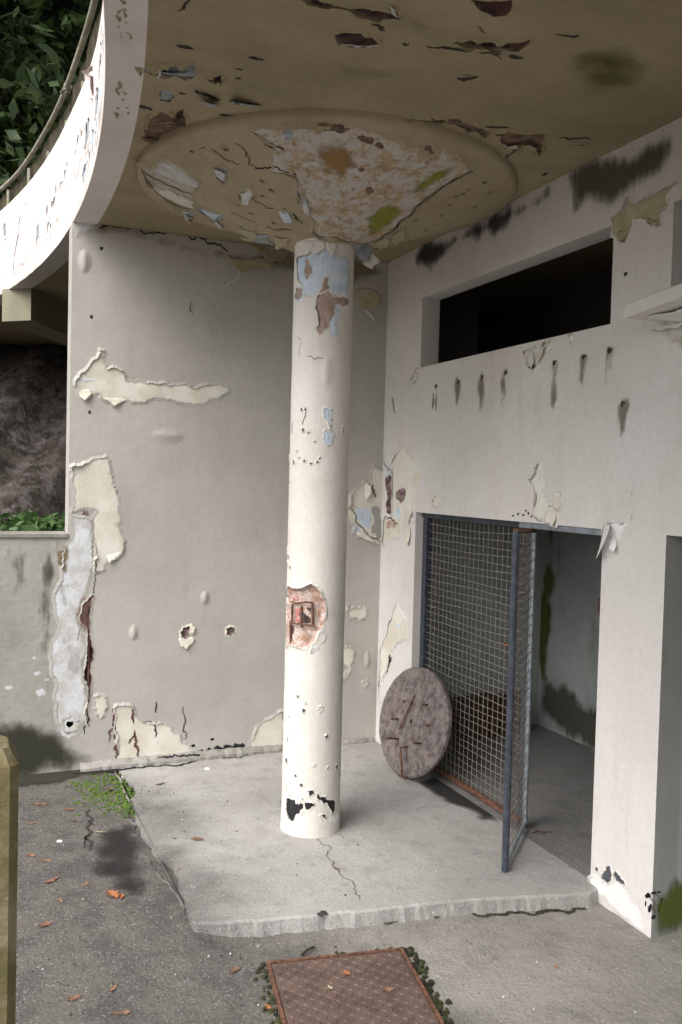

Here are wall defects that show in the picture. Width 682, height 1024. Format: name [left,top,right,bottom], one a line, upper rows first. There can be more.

crack [200,133,296,176]
crack [232,199,302,231]
peeling [135,44,495,337]
water stain [416,242,447,265]
water stain [467,208,520,237]
water stain [571,143,669,209]
peeling [72,347,231,409]
peeling [32,454,199,759]
water stain [543,685,596,750]
peeling [285,756,339,831]
crack [317,838,360,899]
peeling [587,864,663,933]